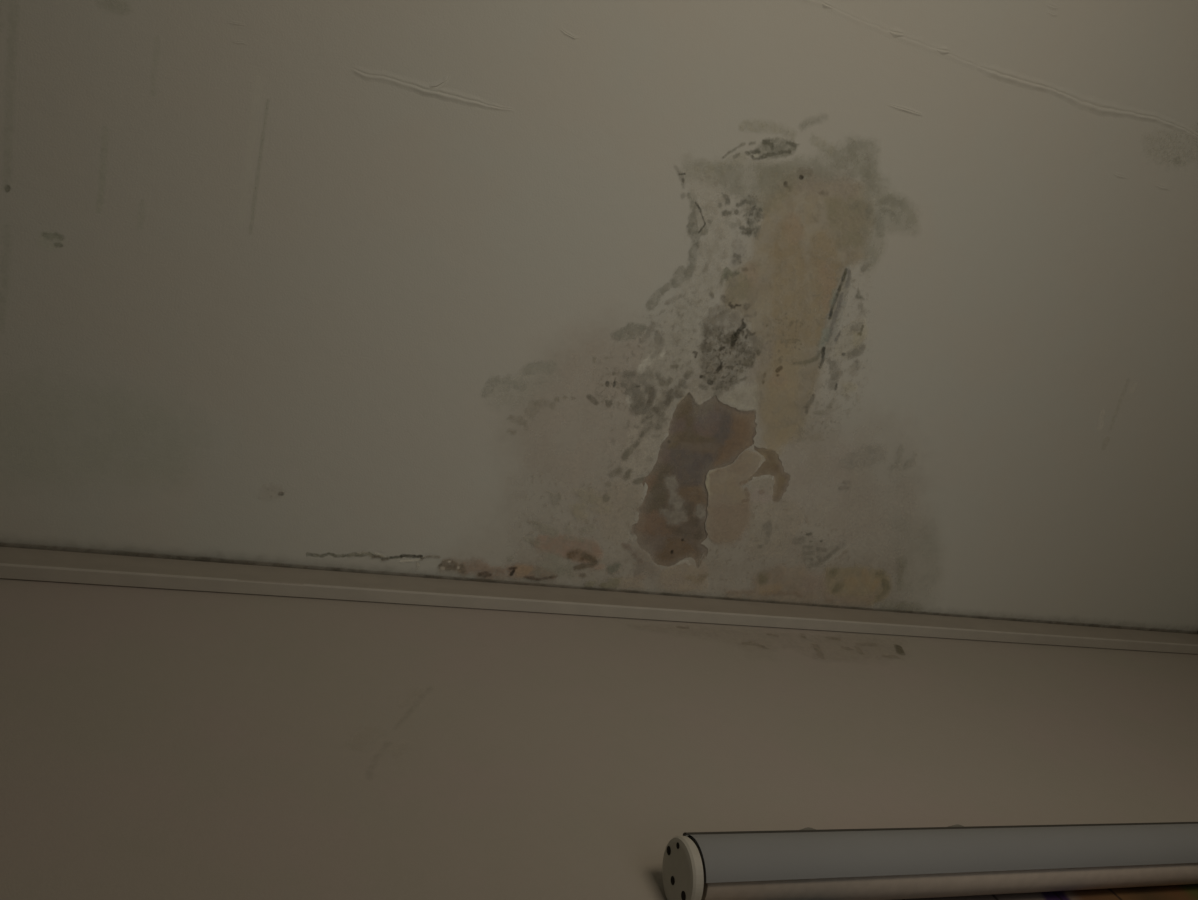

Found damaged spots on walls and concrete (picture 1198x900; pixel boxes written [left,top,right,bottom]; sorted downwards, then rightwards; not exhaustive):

crack [316,552,432,560]
damp [615,304,760,482]
spalling [632,392,791,569]